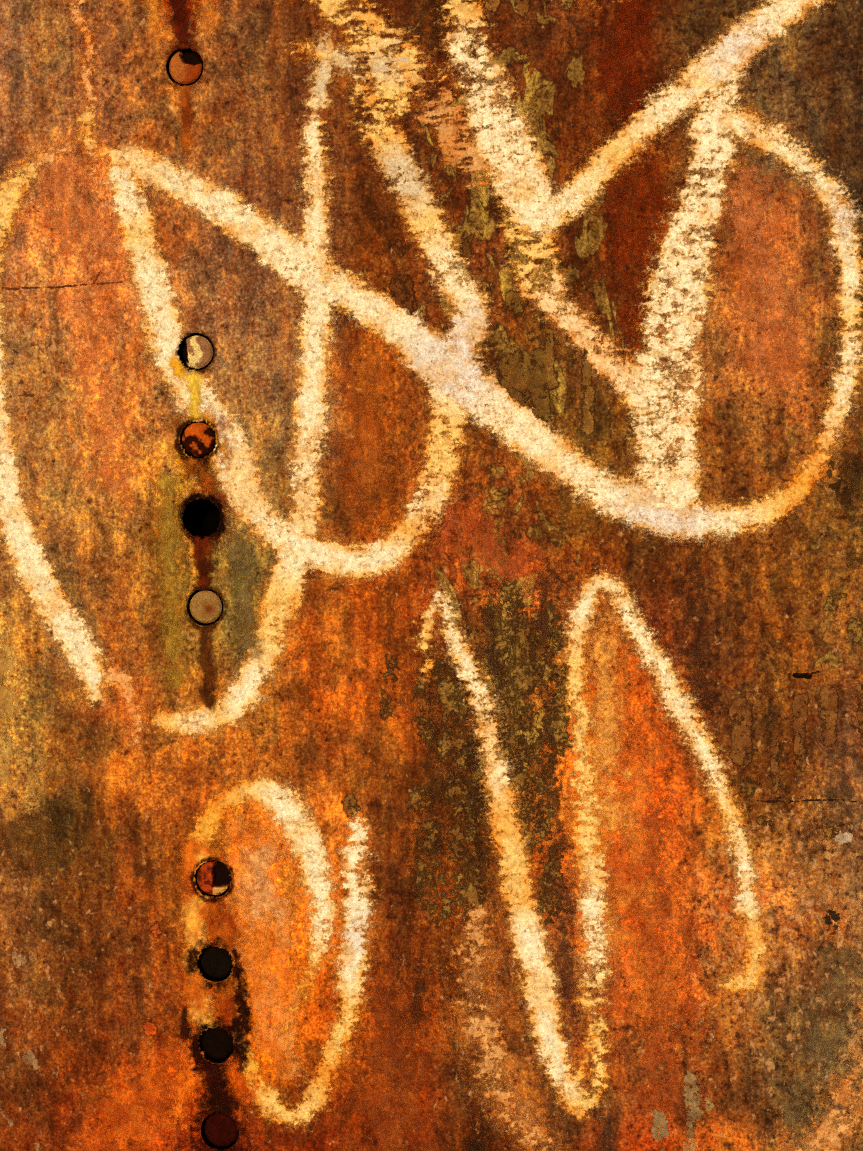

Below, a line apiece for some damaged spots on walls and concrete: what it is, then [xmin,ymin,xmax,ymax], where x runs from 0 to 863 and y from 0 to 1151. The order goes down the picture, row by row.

rust [147,0,219,153]
rust [586,0,661,155]
rust [35,154,141,509]
rust [155,331,263,710]
rust [324,326,401,528]
rust [591,137,670,360]
rust [713,159,831,403]
rust [826,454,863,505]
rust [68,811,308,1151]
rust [334,972,451,1151]
rust [576,613,715,1114]
rust [824,909,840,931]